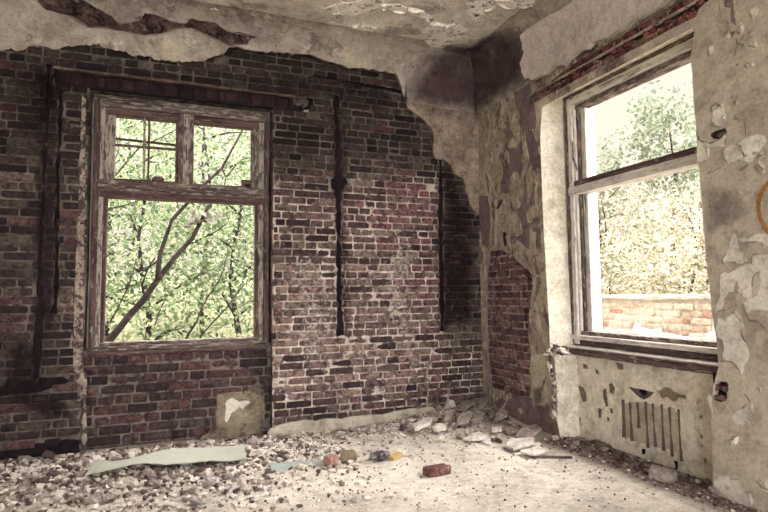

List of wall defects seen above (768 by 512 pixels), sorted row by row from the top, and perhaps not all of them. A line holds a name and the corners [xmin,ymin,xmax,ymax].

flaking render [38,0,258,47]
peeling [324,0,468,49]
peeling [717,0,759,52]
water stain [415,36,521,111]
peeling [695,99,766,175]
flaking render [406,0,709,438]
peeling [714,232,768,374]
flaking render [707,372,729,414]